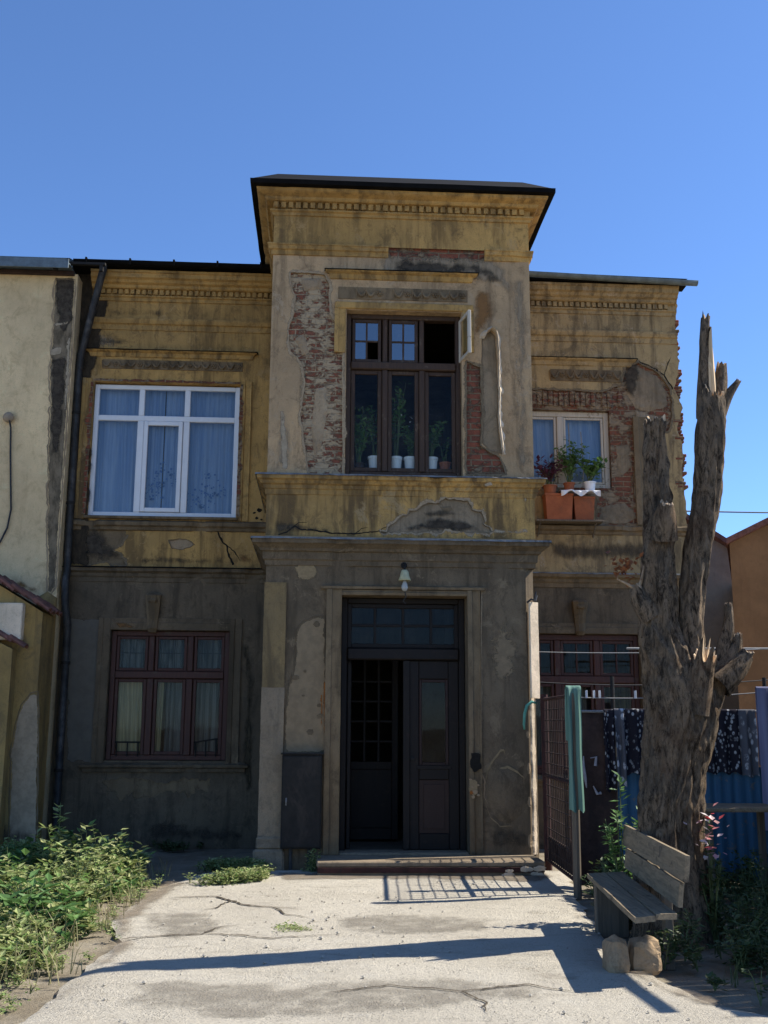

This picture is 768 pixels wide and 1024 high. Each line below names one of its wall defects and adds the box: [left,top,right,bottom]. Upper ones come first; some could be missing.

water stain [71,267,120,566]
flaking render [286,270,347,474]
flaking render [463,326,507,486]
flaking render [524,320,688,526]
crack [217,532,239,565]
crack [278,522,385,535]
flaking render [379,496,495,537]
water stain [409,511,473,530]